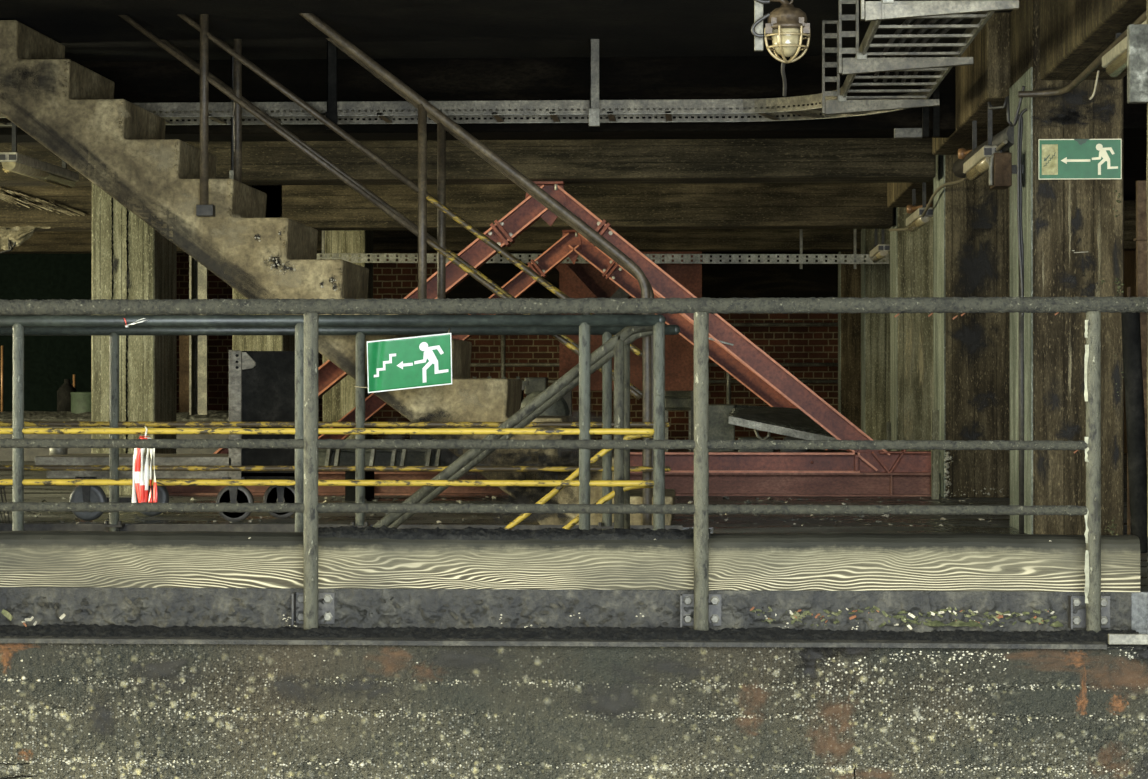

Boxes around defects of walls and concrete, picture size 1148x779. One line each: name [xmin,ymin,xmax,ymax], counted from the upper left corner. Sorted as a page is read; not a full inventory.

rust [1070,652,1088,715]